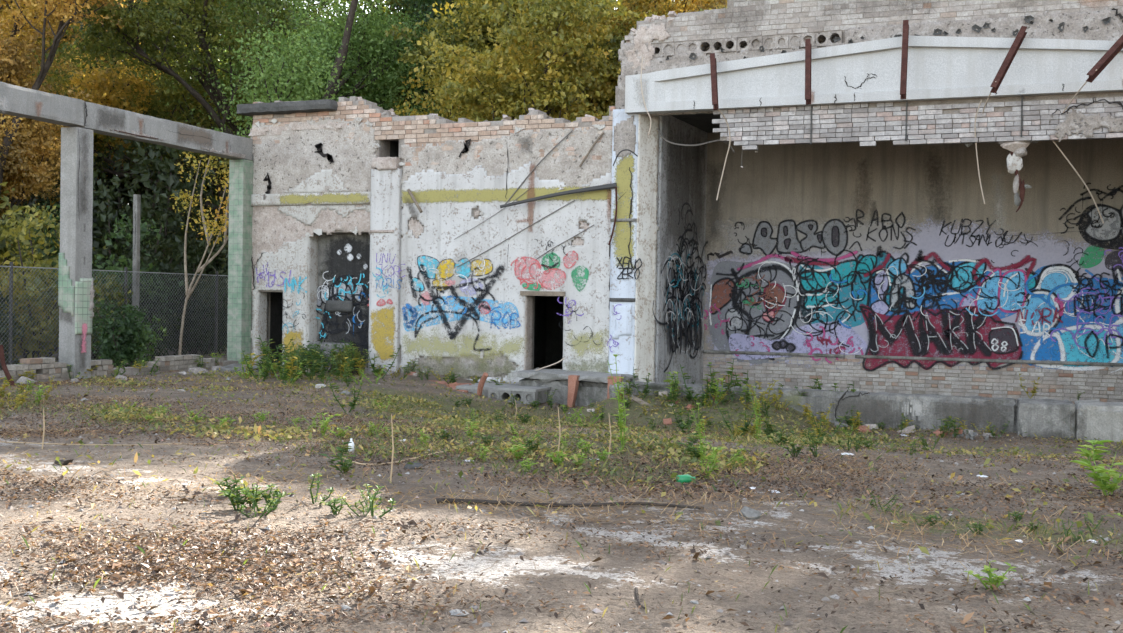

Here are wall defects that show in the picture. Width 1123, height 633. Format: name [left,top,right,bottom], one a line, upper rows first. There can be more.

spalling [625,23,671,71]